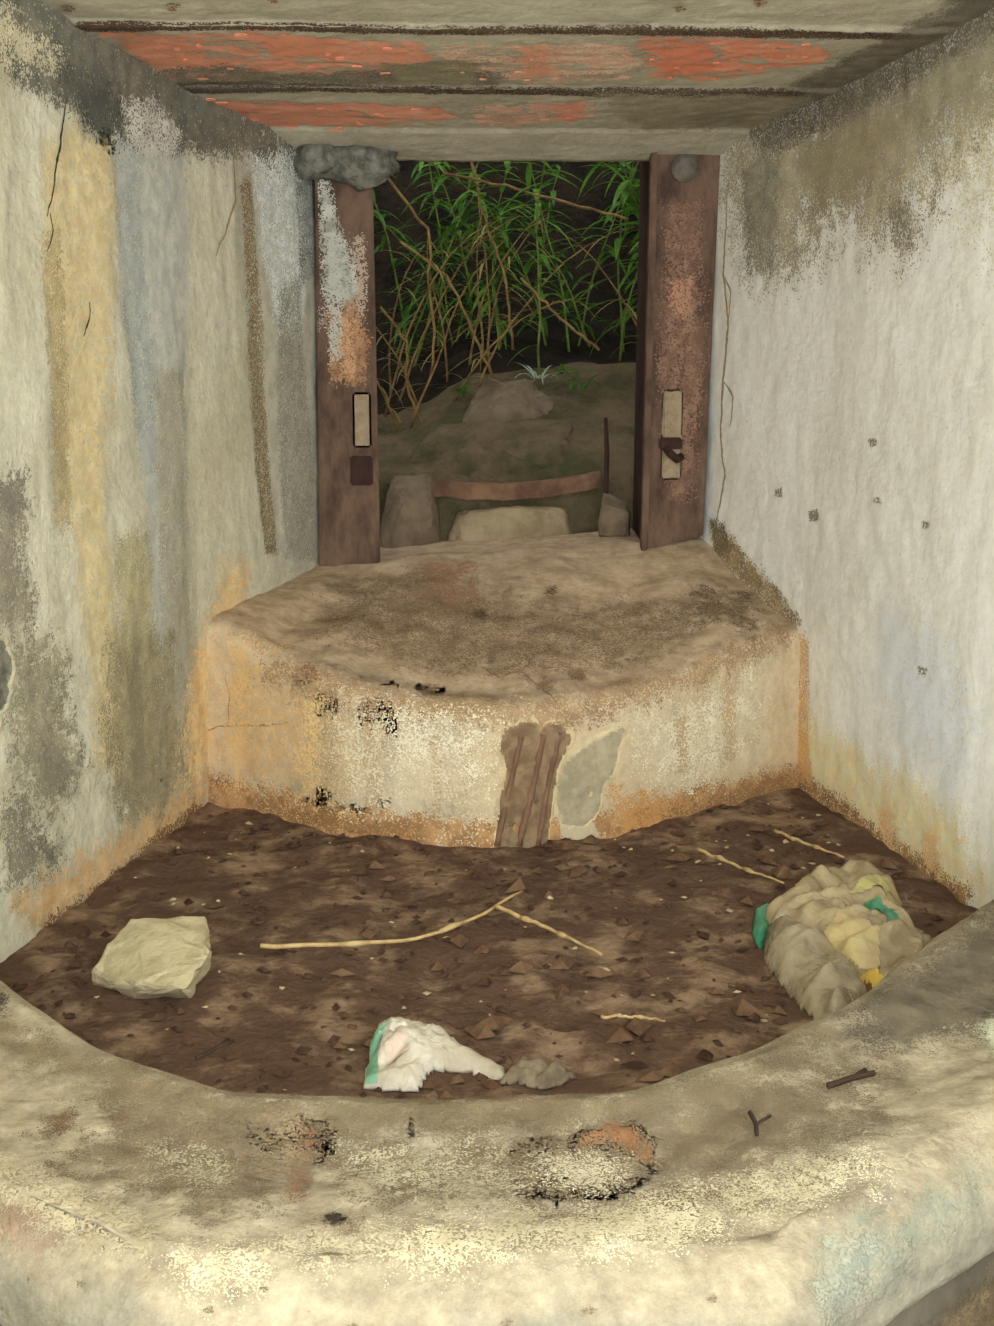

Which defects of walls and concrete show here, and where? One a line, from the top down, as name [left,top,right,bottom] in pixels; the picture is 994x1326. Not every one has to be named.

peeling [89,30,832,85]
peeling [205,98,600,132]
corrosion [322,297,373,389]
corrosion [653,196,711,505]
water stain [0,0,369,908]
flaking render [0,634,17,734]
corrosion [6,546,519,935]
corrosion [576,628,994,908]
corrosion [547,816,572,840]